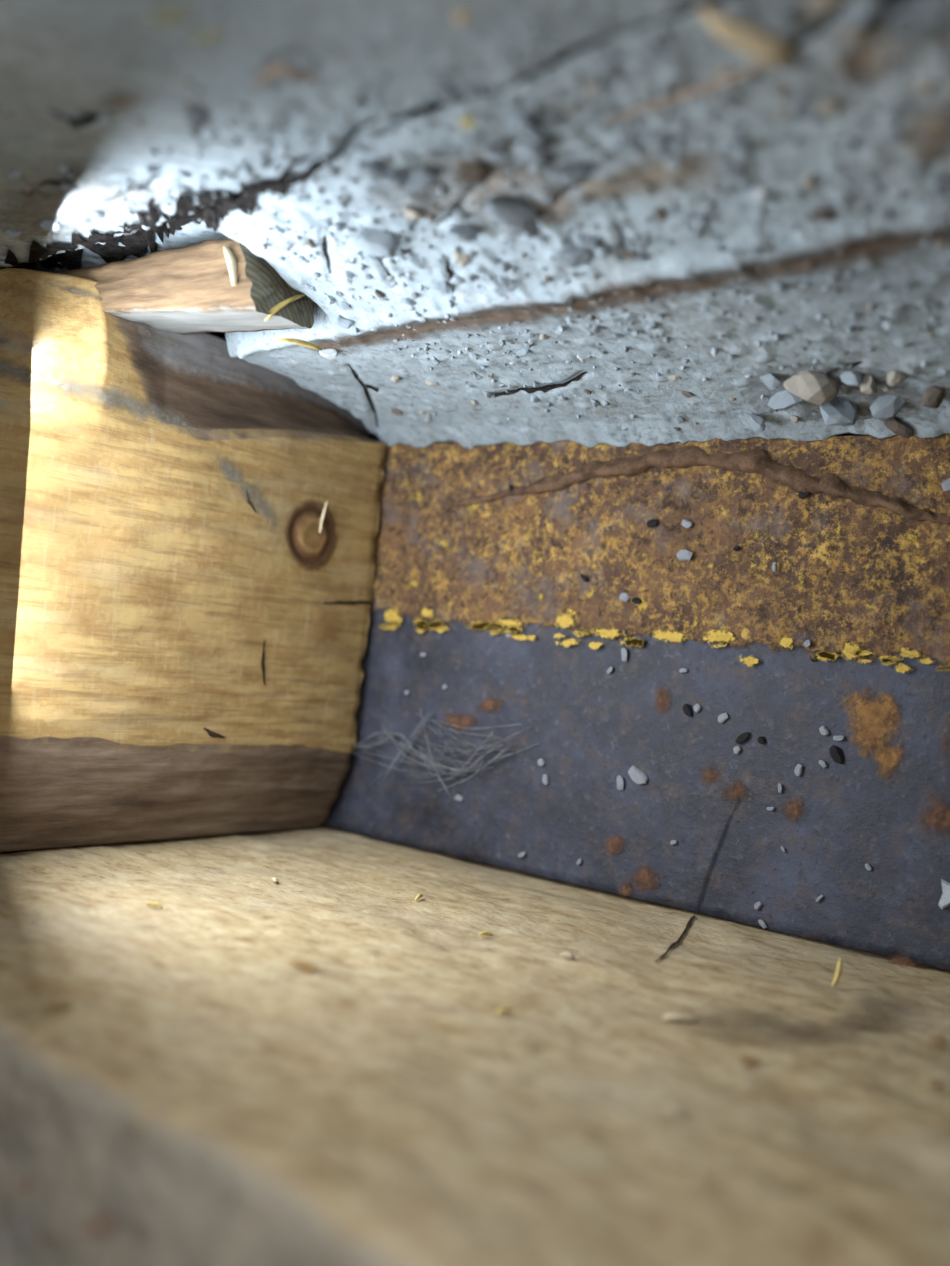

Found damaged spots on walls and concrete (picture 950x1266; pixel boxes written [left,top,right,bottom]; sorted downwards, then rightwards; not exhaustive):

crack [0,0,724,274]
crack [366,228,411,288]
crack [446,258,455,293]
rust [369,434,950,673]
rust [845,692,901,775]